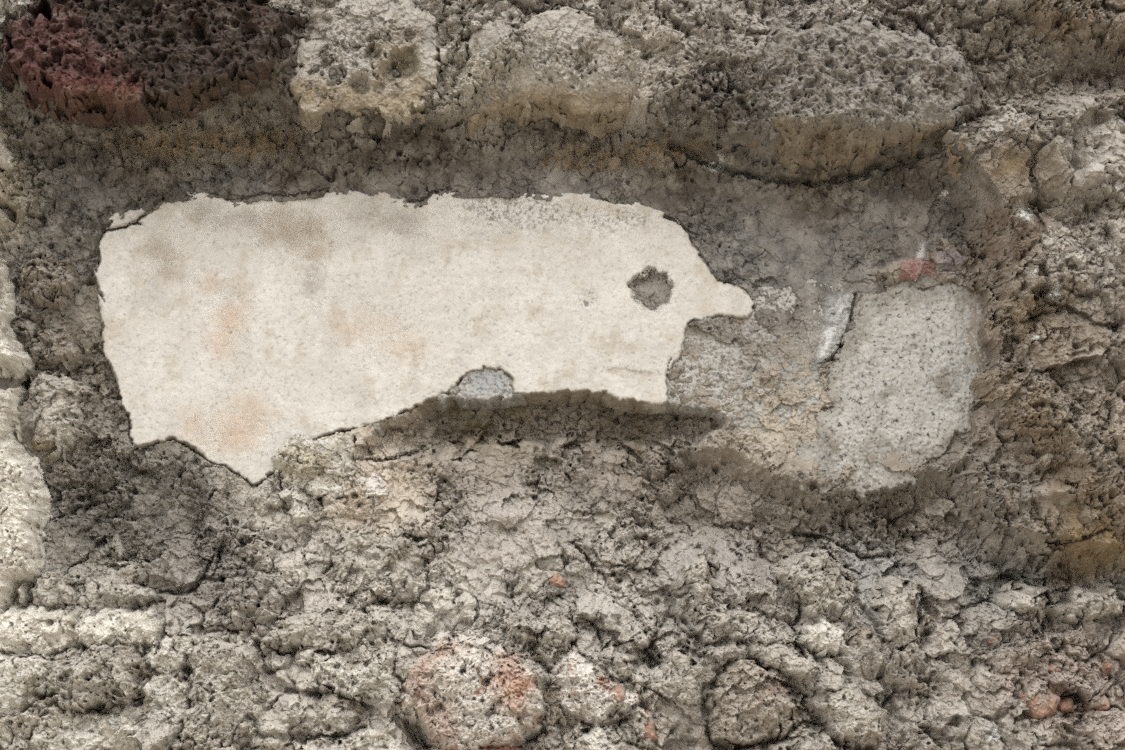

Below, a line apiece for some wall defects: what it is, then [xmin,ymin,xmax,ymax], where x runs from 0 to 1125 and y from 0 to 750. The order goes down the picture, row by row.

crack [817,298,854,364]
spalling [436,367,527,412]
crack [361,450,420,462]
crack [143,535,281,595]